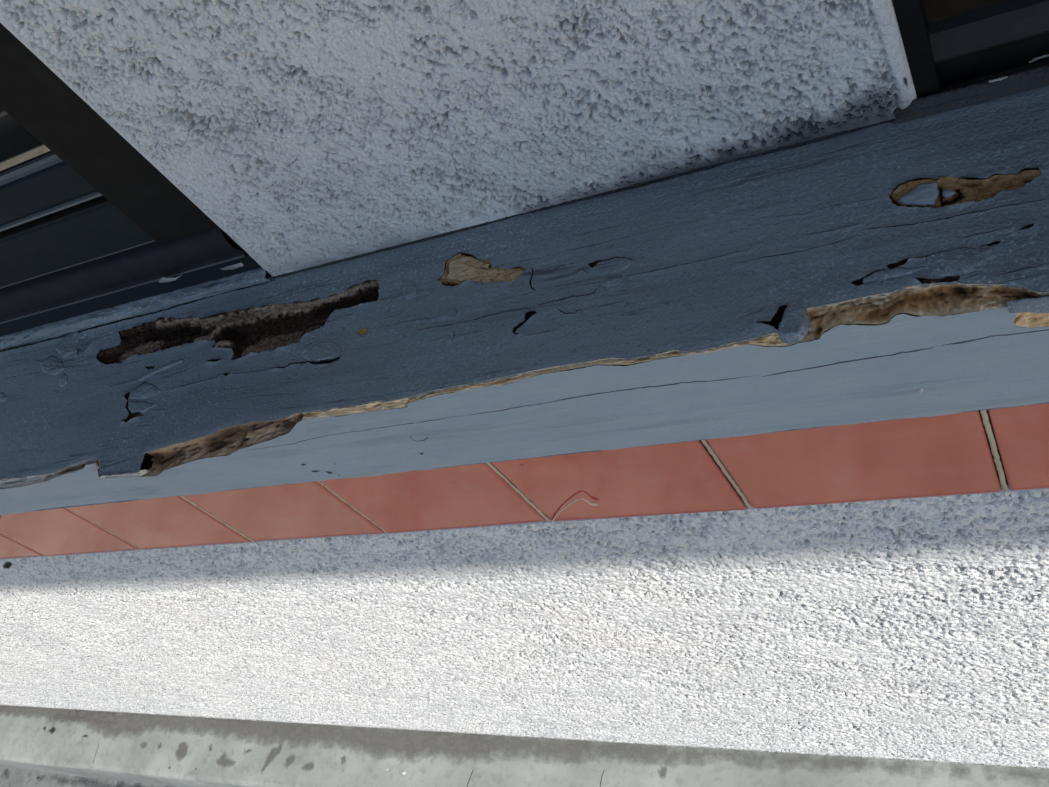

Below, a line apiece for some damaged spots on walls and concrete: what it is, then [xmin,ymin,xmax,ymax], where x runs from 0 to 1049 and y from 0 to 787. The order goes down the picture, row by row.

peeling [446,256,524,282]
crack [426,256,685,337]
crack [851,201,1036,285]
peeling [1007,296,1049,313]
crack [123,366,159,422]
crack [258,329,1049,449]